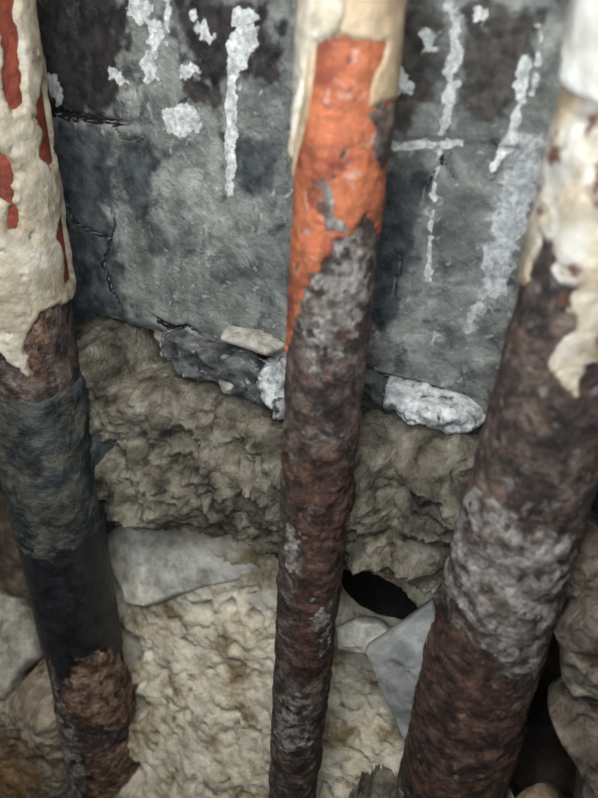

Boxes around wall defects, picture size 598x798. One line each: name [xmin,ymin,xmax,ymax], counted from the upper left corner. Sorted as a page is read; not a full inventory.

damp [170,0,287,109]
damp [394,1,444,133]
damp [459,0,547,121]
damp [220,132,277,195]
damp [371,148,443,329]
damp [463,131,547,334]
rust [24,308,52,380]